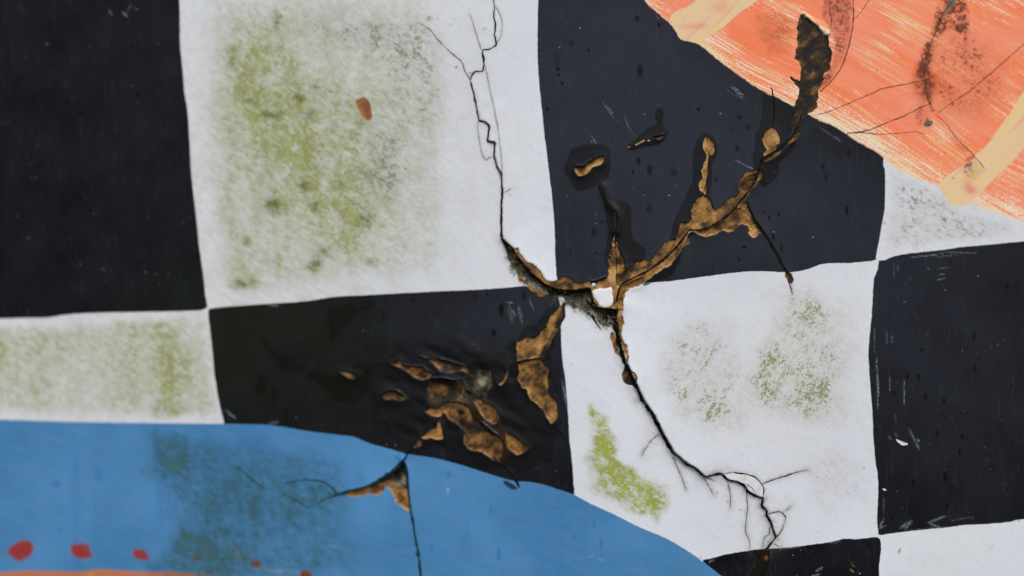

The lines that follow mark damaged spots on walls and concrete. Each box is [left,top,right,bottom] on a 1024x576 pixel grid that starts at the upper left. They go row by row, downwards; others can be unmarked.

peeling [391,13,832,462]
crack [420,0,1024,576]
peeling [383,391,407,400]
crack [237,416,439,576]
peeling [347,465,410,511]